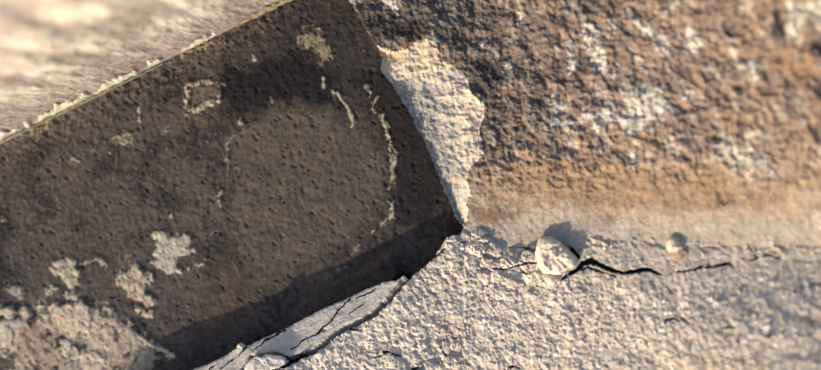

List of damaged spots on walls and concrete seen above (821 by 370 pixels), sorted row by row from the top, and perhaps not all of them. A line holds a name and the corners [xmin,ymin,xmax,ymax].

damp [181,32,215,53]
damp [189,85,219,107]
damp [322,76,356,128]
damp [215,117,248,207]
damp [364,83,398,190]
spalling [377,38,485,225]
damp [372,200,395,234]
crack [493,247,537,274]
crack [561,244,781,281]
peeling [0,230,205,370]